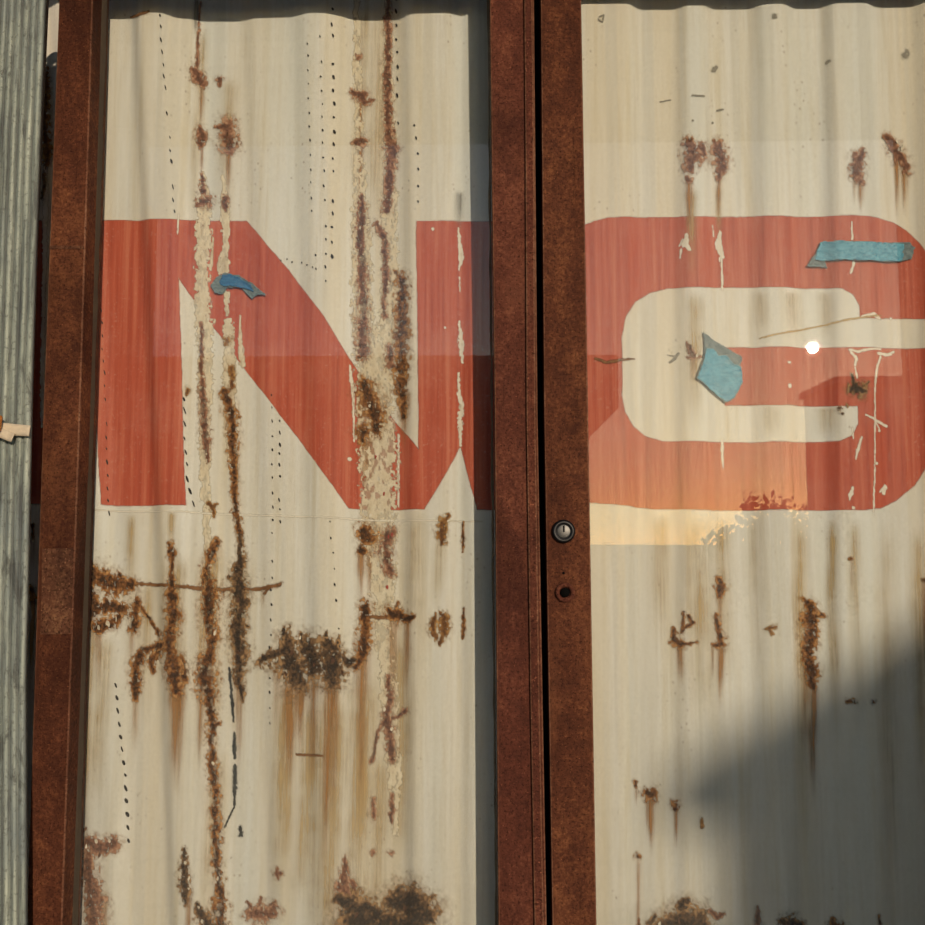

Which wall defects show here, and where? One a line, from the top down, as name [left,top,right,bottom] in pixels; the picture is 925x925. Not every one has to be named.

rust [189,1,225,106]
rust [194,116,242,212]
rust [677,136,730,217]
rust [847,147,867,199]
rust [882,133,912,193]
rust [349,0,413,462]
rust [90,321,416,925]
rust [668,611,698,669]
rust [799,596,826,759]
rust [81,827,121,925]
rust [331,855,443,925]
rust [637,896,726,925]